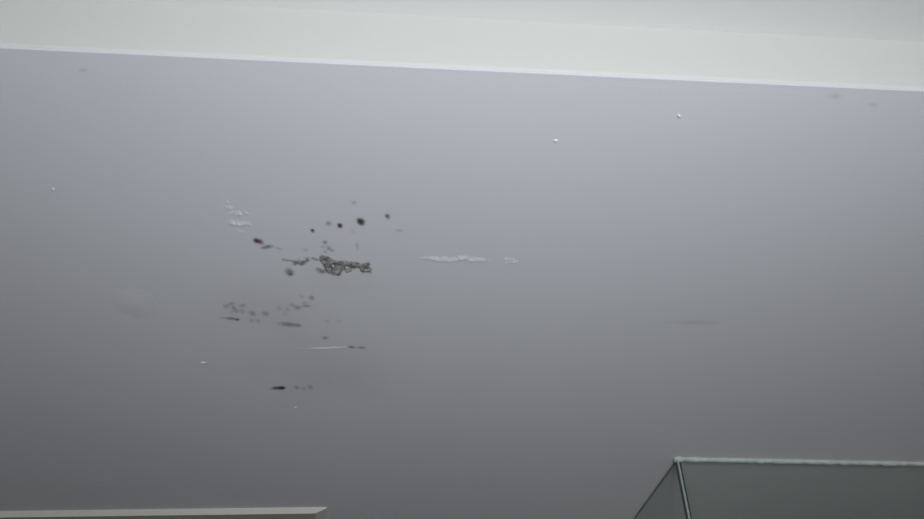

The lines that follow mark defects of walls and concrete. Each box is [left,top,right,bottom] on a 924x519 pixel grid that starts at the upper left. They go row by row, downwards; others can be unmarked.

flaking render [287,256,371,276]